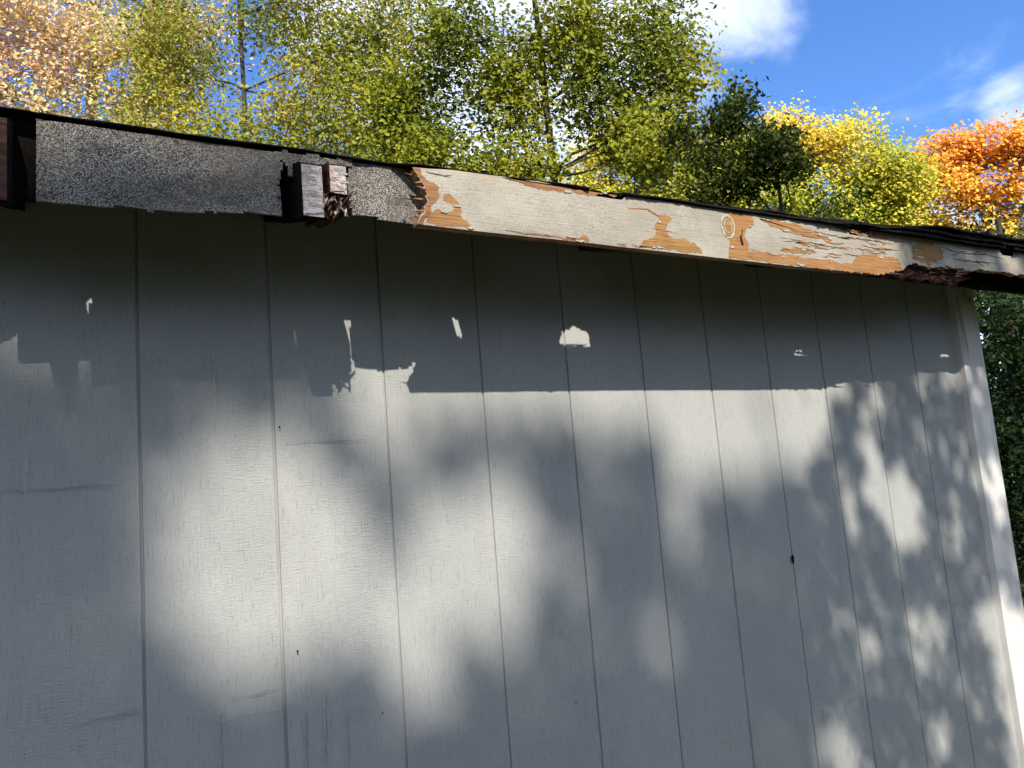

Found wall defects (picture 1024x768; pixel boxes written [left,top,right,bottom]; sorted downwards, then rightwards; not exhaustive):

peeling [502,177,621,197]
peeling [426,193,474,229]
peeling [565,235,589,243]
peeling [618,214,702,254]
peeling [726,212,964,275]